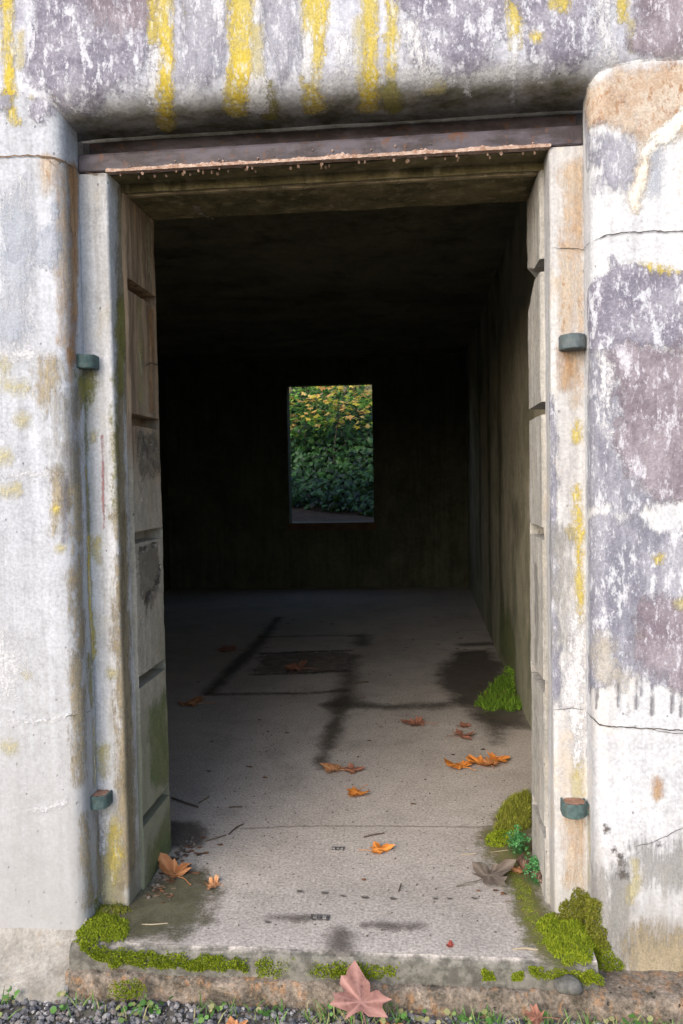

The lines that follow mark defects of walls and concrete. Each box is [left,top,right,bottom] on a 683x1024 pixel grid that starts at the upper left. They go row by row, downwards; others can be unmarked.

corrosion [585,62,683,177]
crack [553,230,683,250]
leakage [313,621,529,765]
crack [531,685,683,767]